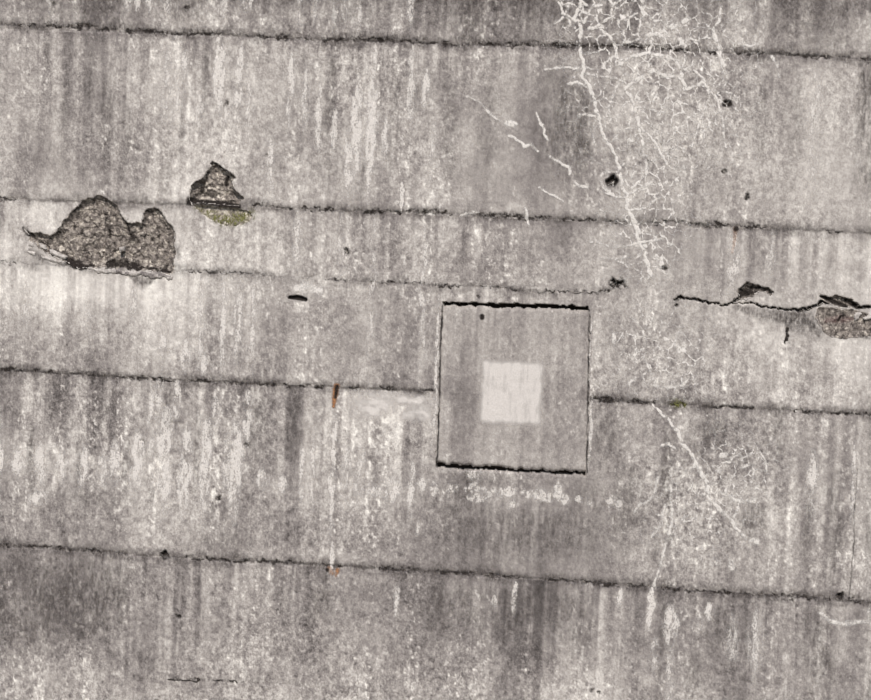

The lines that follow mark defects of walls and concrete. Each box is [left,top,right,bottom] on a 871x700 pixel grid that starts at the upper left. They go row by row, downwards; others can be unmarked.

crack [1,21,225,37]
damp [285,48,389,200]
spalling [22,195,176,285]
spalling [187,161,252,227]
crack [245,0,871,626]
crack [1,367,323,389]
damp [0,367,221,521]
damp [221,390,258,521]
damp [327,414,592,535]
crack [0,540,127,557]
crack [185,553,469,575]
damp [646,586,680,700]